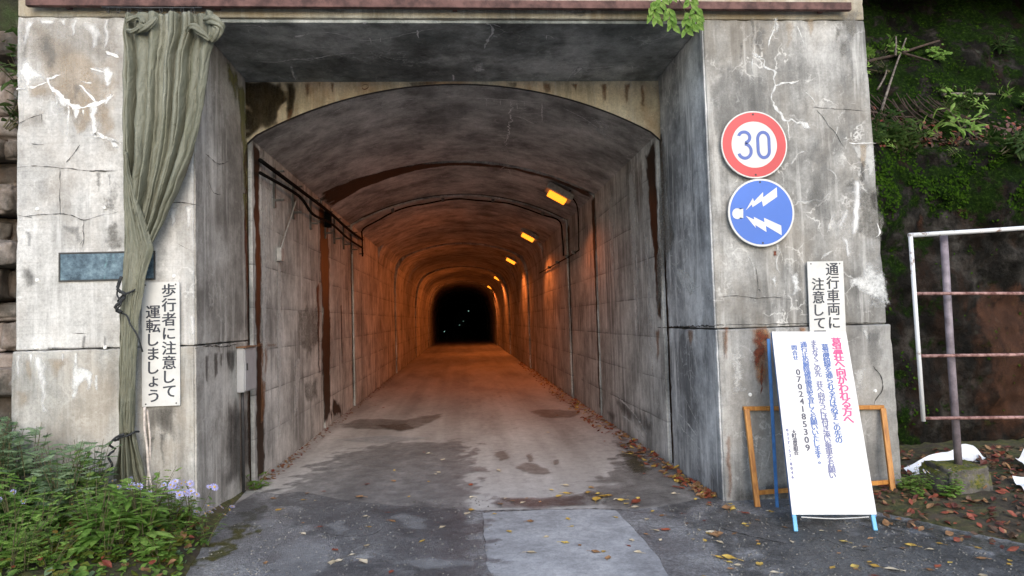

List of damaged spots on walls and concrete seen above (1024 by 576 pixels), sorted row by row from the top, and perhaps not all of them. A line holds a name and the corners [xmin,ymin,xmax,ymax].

crack [752,19,861,164]
crack [16,62,121,247]
crack [793,169,837,259]
damp [228,64,295,479]
damp [851,266,887,301]
damp [206,352,234,379]
corrosion [753,329,769,392]